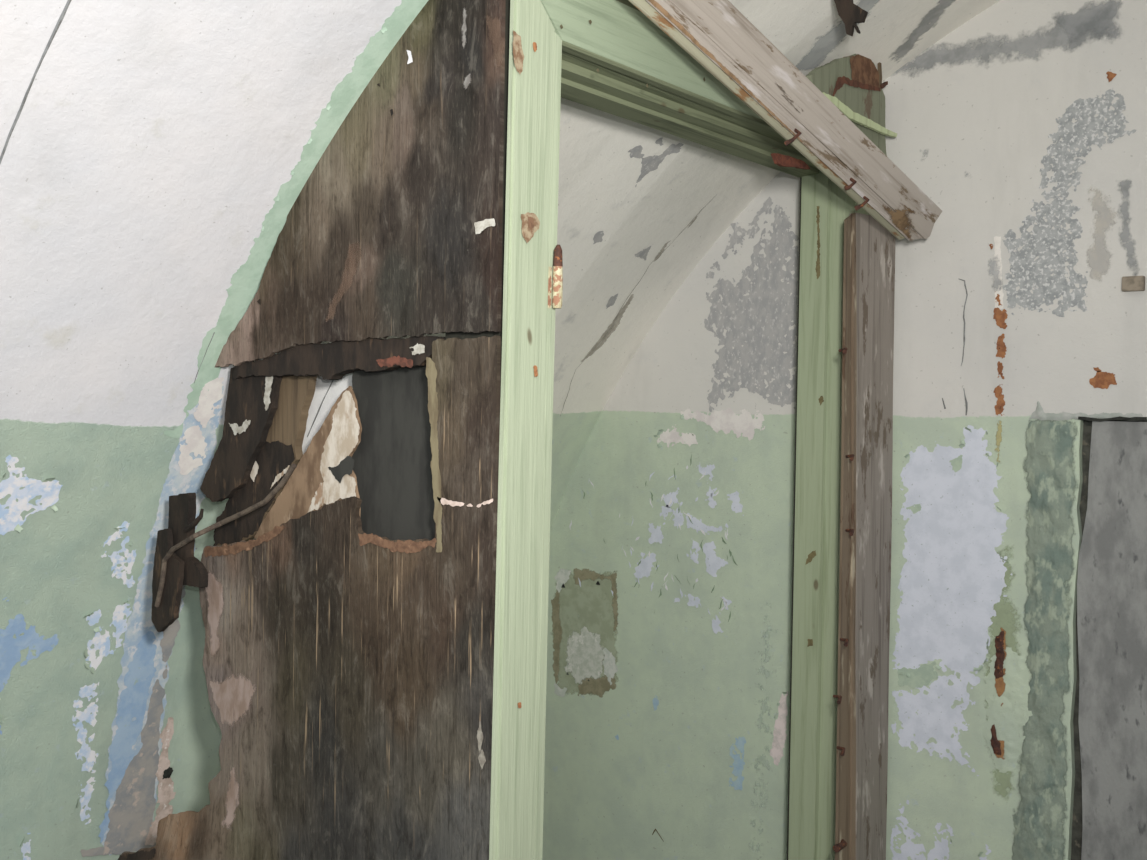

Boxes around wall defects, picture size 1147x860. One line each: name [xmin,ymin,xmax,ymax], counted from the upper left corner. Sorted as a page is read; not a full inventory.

peeling [989,89,1136,317]
peeling [619,197,799,634]
rust [989,236,1008,462]
rust [1089,367,1117,389]
peeling [0,455,63,535]
peeling [0,614,59,700]
flaking render [72,377,251,857]
peeling [891,425,1013,776]
rust [986,549,1017,706]
peeling [20,833,31,860]
peeling [890,800,954,860]
rust [990,725,1011,797]